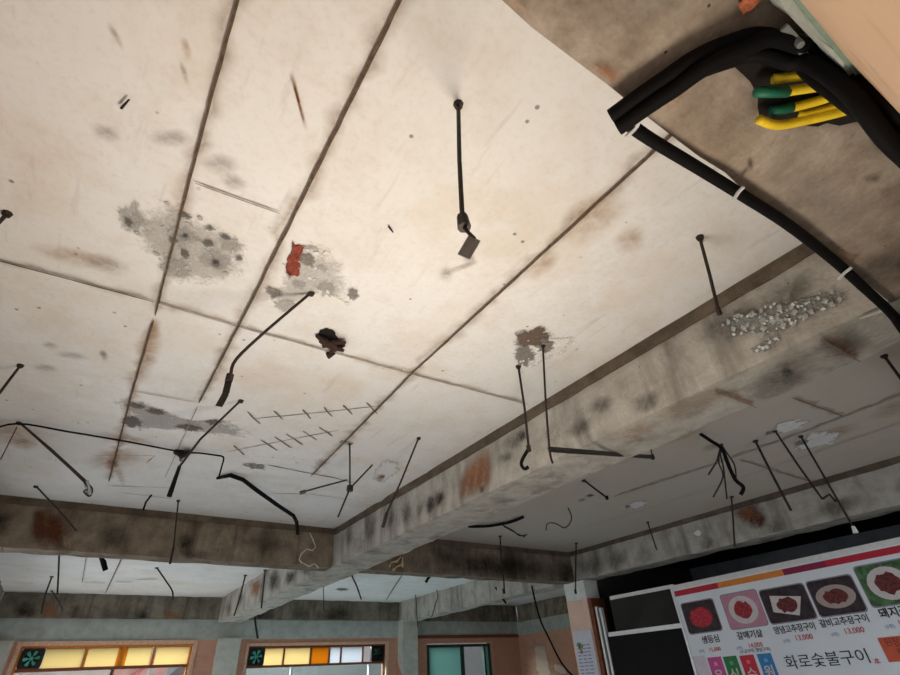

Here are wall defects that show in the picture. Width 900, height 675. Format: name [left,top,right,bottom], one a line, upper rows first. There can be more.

spalling [119,202,243,278]
spalling [266,242,359,312]
peeling [514,327,572,367]
spalling [721,290,847,352]